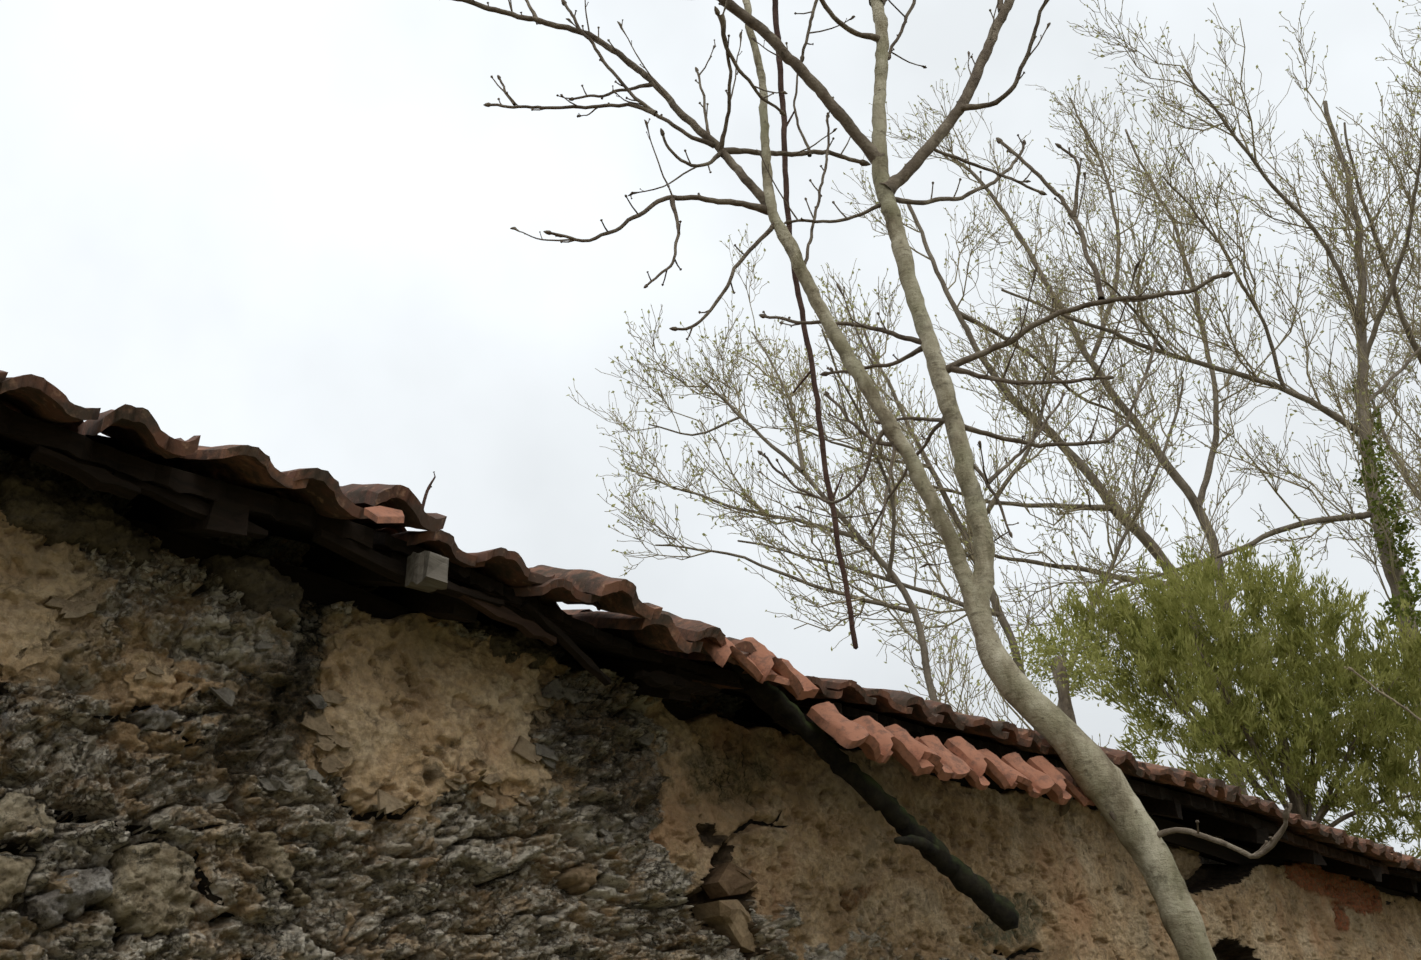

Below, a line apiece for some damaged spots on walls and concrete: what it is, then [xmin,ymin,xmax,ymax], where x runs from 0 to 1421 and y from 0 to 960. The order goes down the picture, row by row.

flaking render [119,613,669,843]
spalling [681,823,771,960]
crack [731,811,787,835]
spalling [1212,938,1261,960]